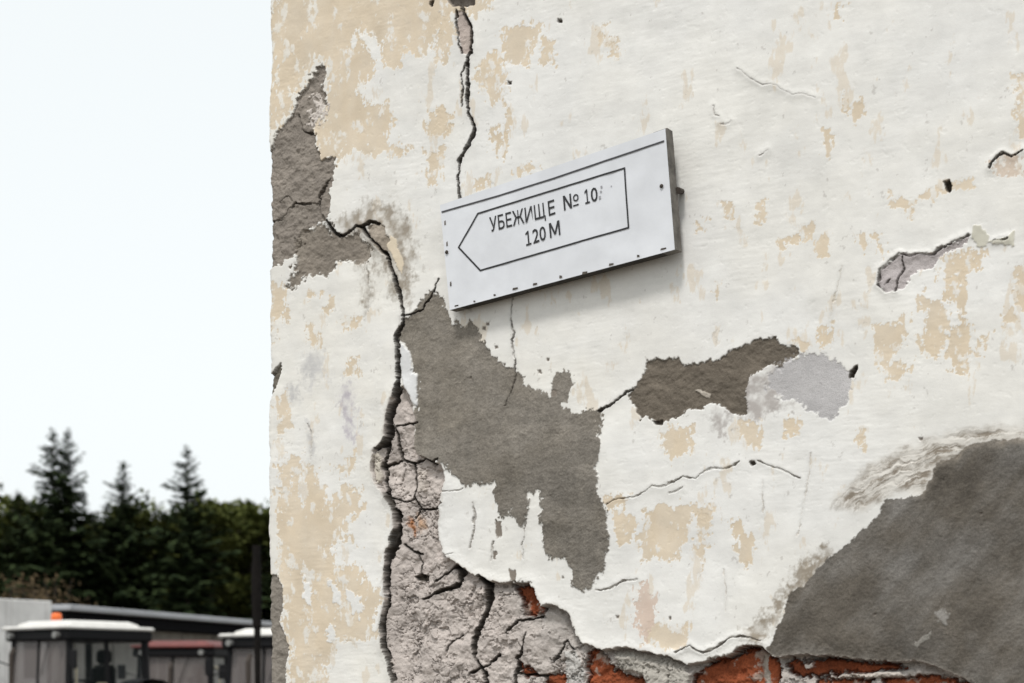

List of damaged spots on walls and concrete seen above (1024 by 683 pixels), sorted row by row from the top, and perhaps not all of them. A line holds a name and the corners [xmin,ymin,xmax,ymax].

crack [299,114,315,136]
peeling [269,0,558,344]
crack [456,7,477,196]
crack [737,67,815,98]
crack [988,149,1023,169]
peeling [1008,72,1024,139]
peeling [855,224,1024,383]
crack [273,179,575,683]
flaking render [764,320,853,440]
flaking render [270,344,967,683]
crack [607,454,811,536]